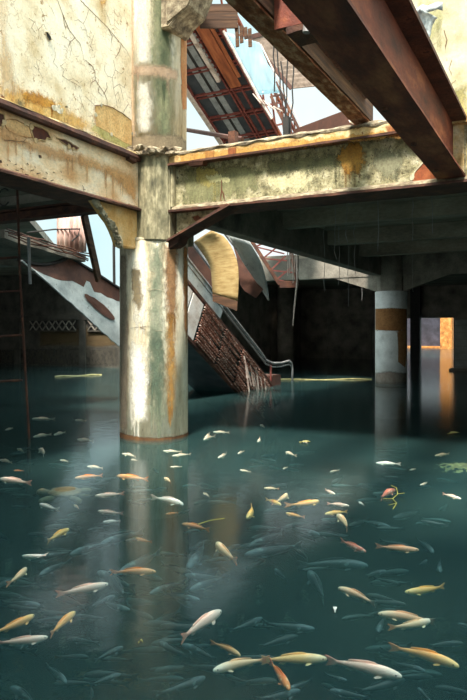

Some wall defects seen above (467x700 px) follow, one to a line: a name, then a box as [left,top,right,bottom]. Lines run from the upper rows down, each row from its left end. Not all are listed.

flaking render [0,112,79,151]
crack [29,0,128,111]
water stain [0,0,186,151]
flaking render [94,103,133,145]
water stain [182,153,342,205]
corrosion [165,247,188,425]